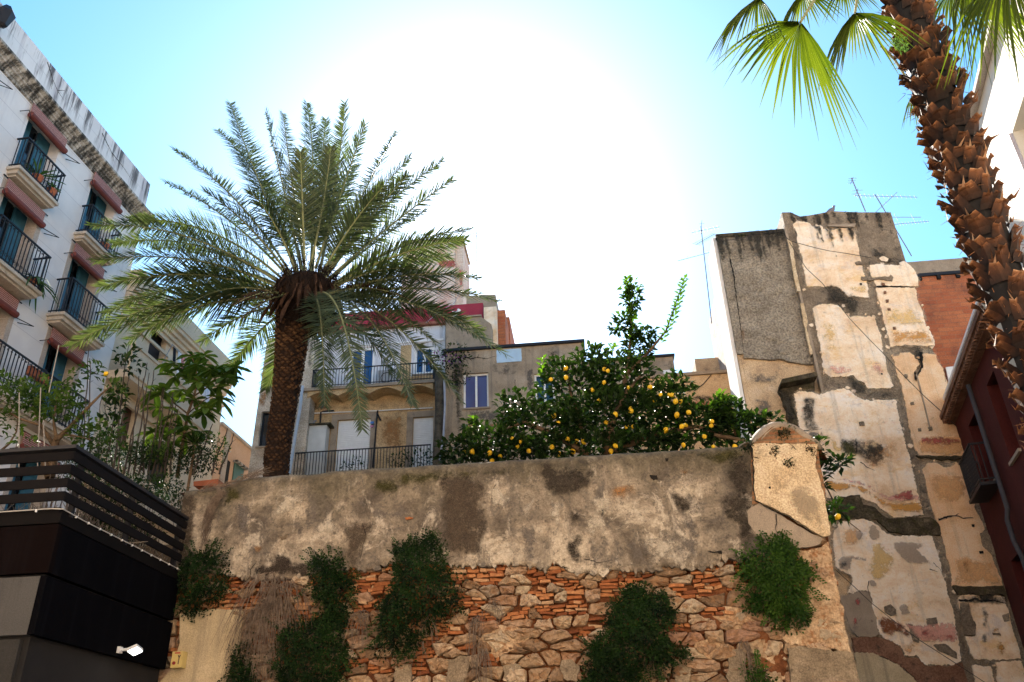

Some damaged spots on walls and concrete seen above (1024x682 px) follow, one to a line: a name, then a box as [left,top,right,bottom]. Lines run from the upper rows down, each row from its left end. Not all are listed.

damp [715,211,891,260]
damp [846,440,893,464]
flaking render [752,220,1024,682]
damp [440,476,504,554]
damp [541,464,609,531]
damp [568,535,581,561]
flaking render [439,551,750,578]